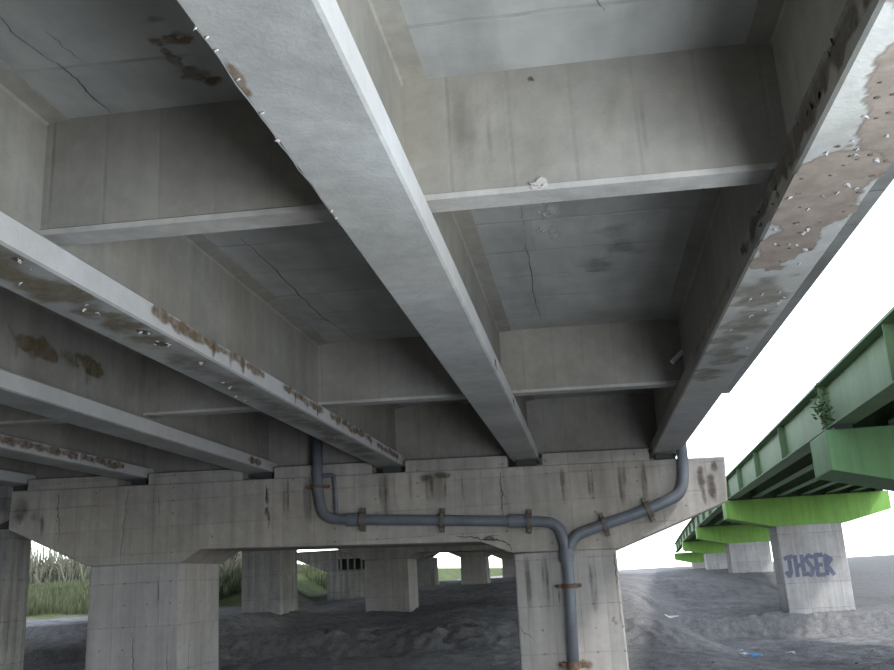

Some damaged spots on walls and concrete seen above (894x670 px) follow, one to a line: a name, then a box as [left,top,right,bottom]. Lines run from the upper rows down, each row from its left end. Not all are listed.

crack [0,17,111,113]
peeling [740,0,894,271]
peeling [0,255,171,346]
corrosion [0,436,124,469]
damp [698,462,717,499]
crack [457,535,512,551]